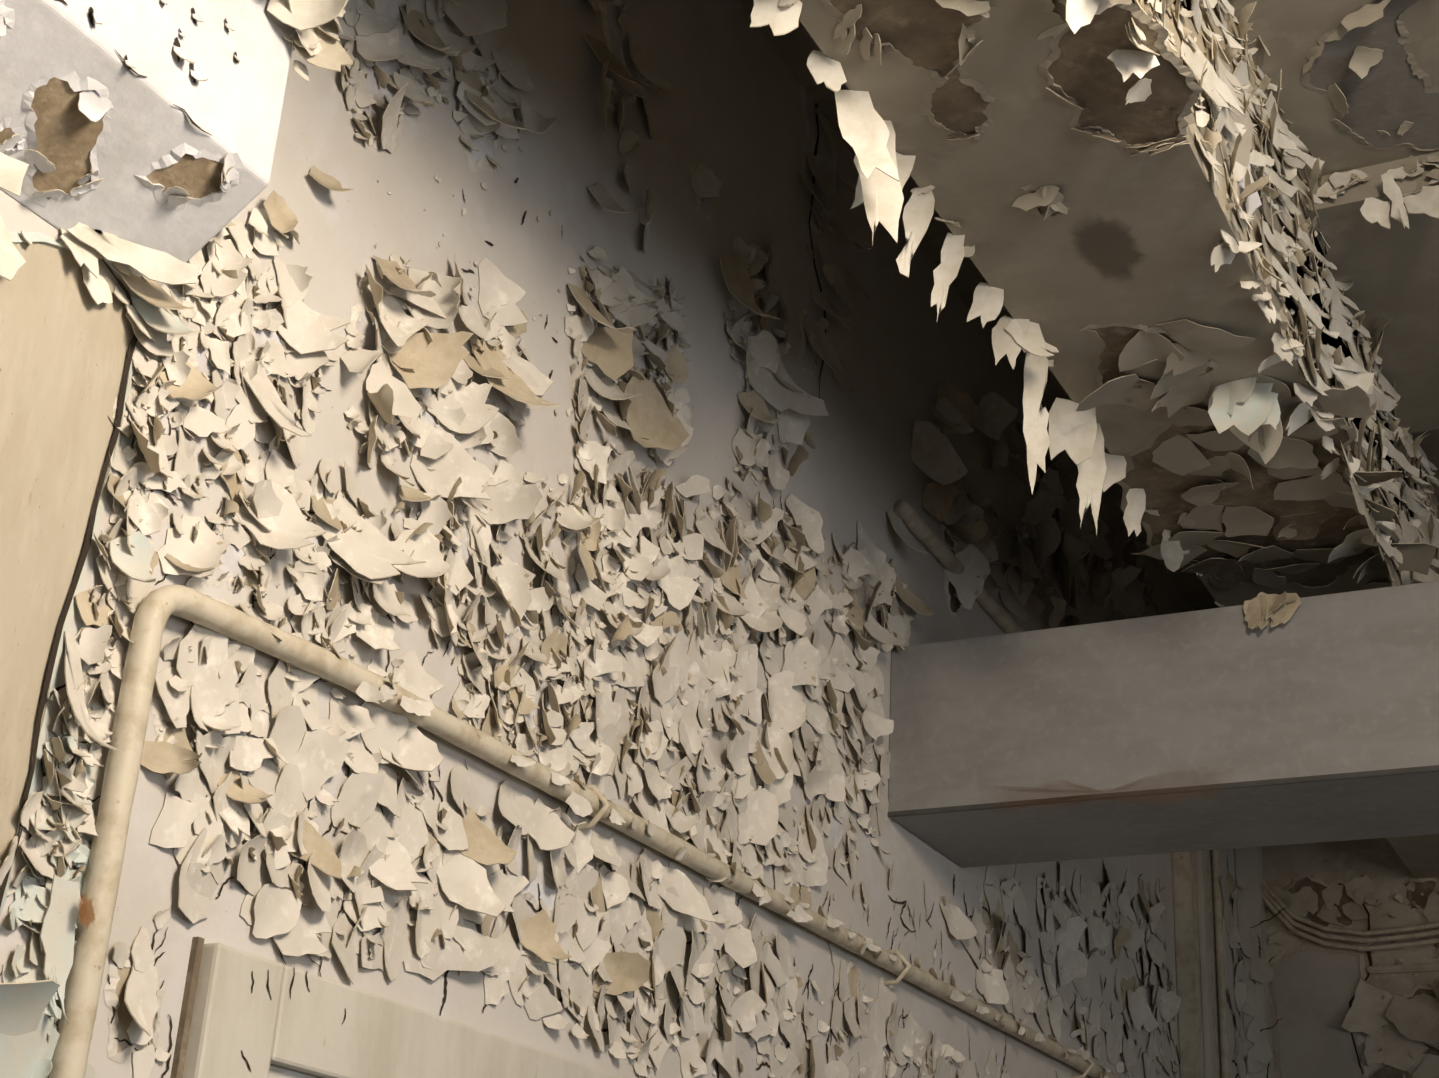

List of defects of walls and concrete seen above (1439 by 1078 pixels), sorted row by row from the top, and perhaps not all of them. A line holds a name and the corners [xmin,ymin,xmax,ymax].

peeling [89,7,102,26]
flaking render [135,142,244,210]
peeling [173,8,208,83]
peeling [267,0,561,192]
peeling [750,0,802,36]
peeling [806,0,998,319]
flaking render [0,190,1182,1078]
flaking render [1220,861,1439,1078]